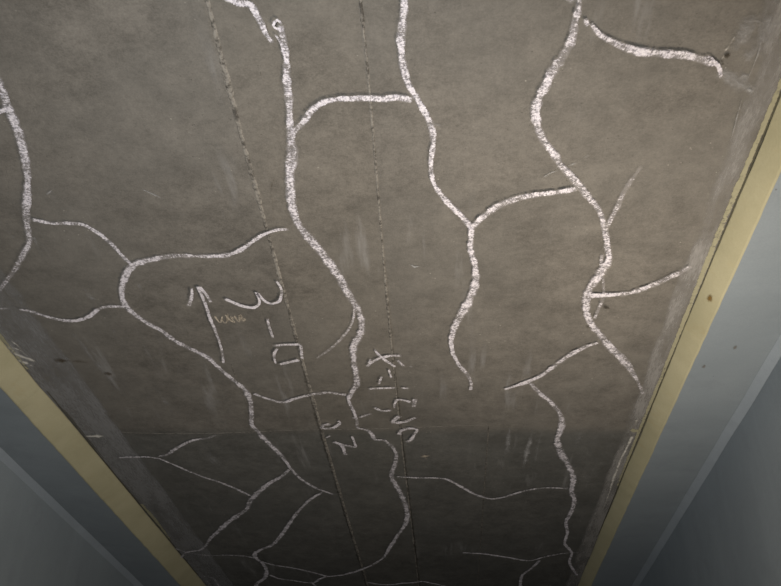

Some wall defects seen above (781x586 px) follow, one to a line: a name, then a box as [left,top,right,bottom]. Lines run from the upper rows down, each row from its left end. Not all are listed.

crack [0,84,536,586]
crack [226,0,722,586]